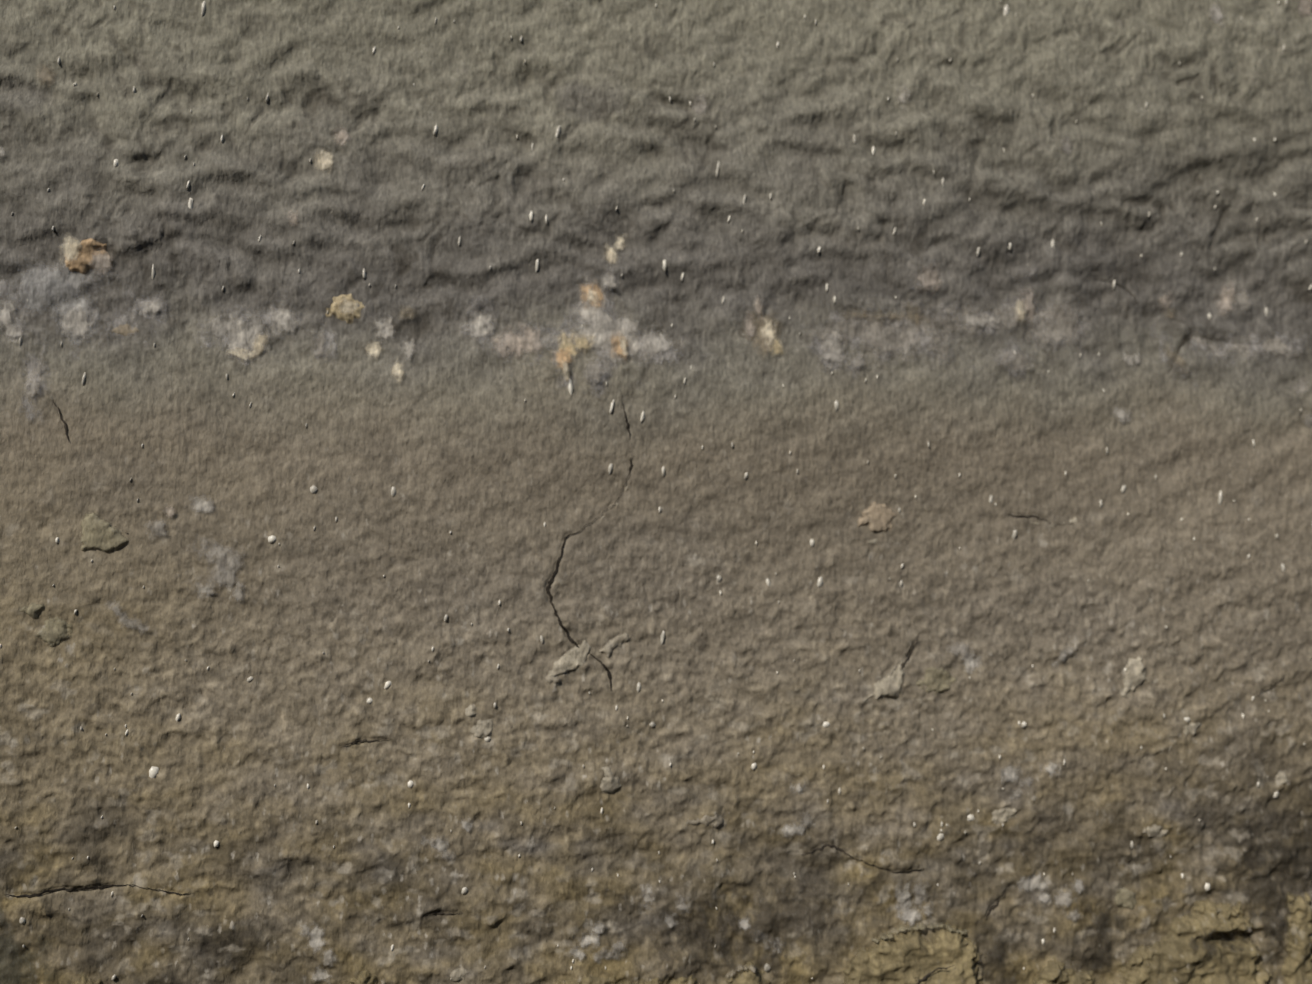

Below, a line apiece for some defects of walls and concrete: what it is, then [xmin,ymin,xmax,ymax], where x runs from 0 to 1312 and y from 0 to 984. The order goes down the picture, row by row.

corrosion [63,237,110,275]
water stain [0,265,167,344]
water stain [206,306,336,362]
corrosion [326,294,365,324]
water stain [366,308,413,381]
water stain [464,238,683,392]
water stain [812,272,1082,376]
crack [546,395,633,691]
crack [7,884,193,898]
water stain [300,925,336,980]
crack [801,843,924,873]
water stain [1018,874,1123,968]